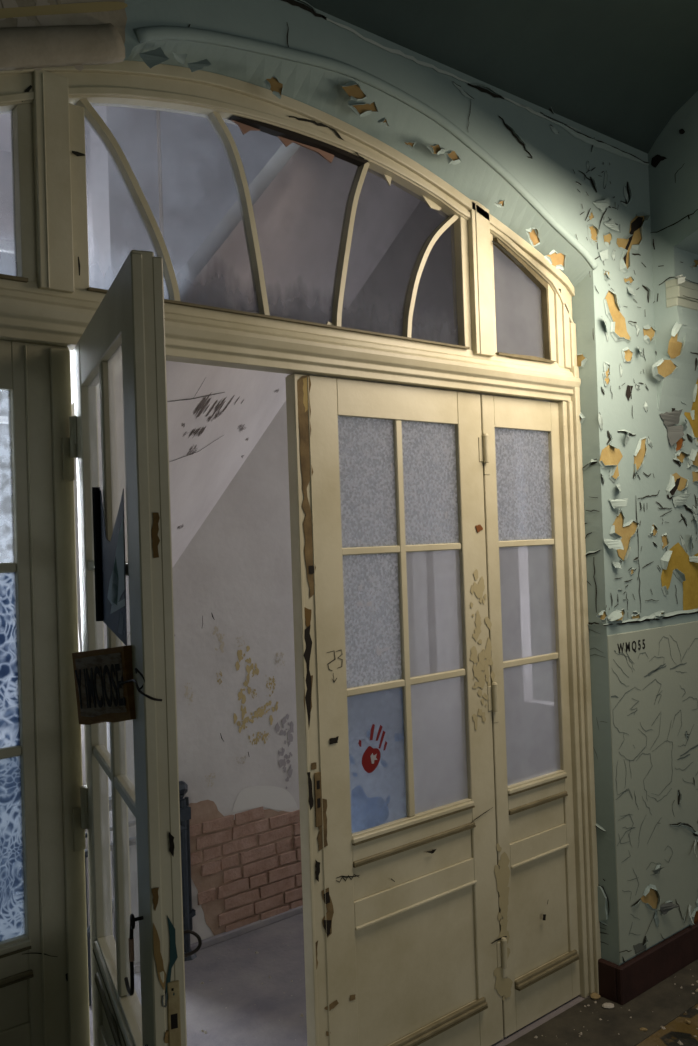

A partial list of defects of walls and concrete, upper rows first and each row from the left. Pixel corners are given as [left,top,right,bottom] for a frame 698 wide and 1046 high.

peeling [264,76,283,99]
peeling [341,81,389,127]
peeling [404,141,461,165]
peeling [525,228,566,271]
peeling [587,196,656,400]
peeling [577,353,588,369]
peeling [651,322,686,381]
peeling [660,380,698,523]
peeling [579,411,698,627]
flaking render [189,800,303,936]
peeling [641,867,698,925]